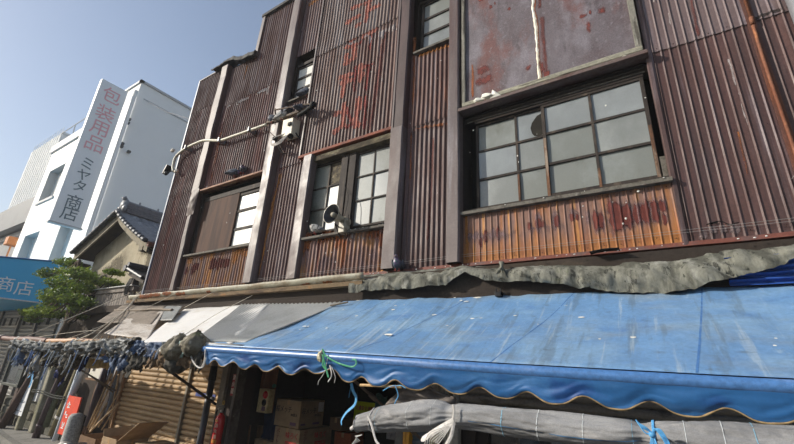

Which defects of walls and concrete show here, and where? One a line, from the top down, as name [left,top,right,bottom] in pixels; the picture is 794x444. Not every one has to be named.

corrosion [471,65,491,97]
corrosion [527,211,560,231]
corrosion [569,199,668,234]
corrosion [185,248,248,275]
corrosion [303,231,347,267]
corrosion [366,230,383,248]
corrosion [468,226,506,247]